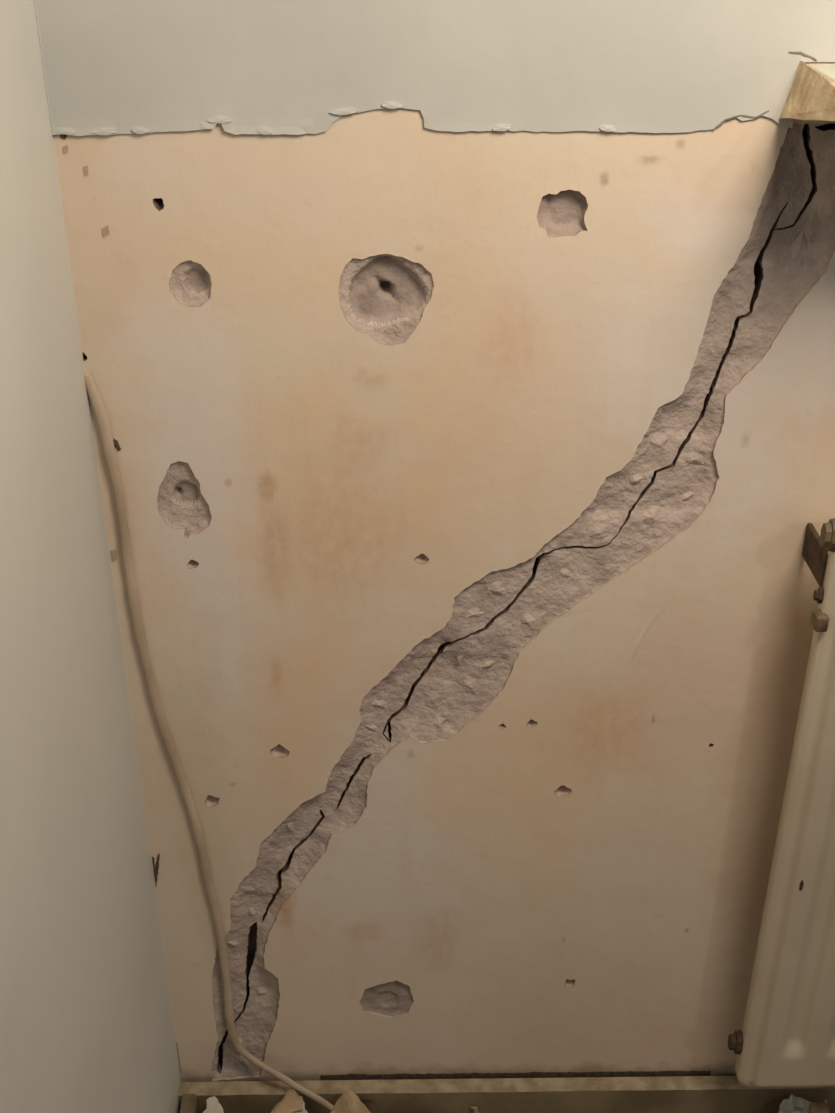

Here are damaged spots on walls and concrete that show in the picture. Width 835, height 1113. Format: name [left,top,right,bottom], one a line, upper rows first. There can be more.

peeling [34,0,835,139]
flaking render [169,260,212,307]
flaking render [157,461,212,538]
crack [217,124,835,1073]
flaking render [225,123,835,1062]
flaking render [152,854,160,884]
flaking render [212,949,262,1081]